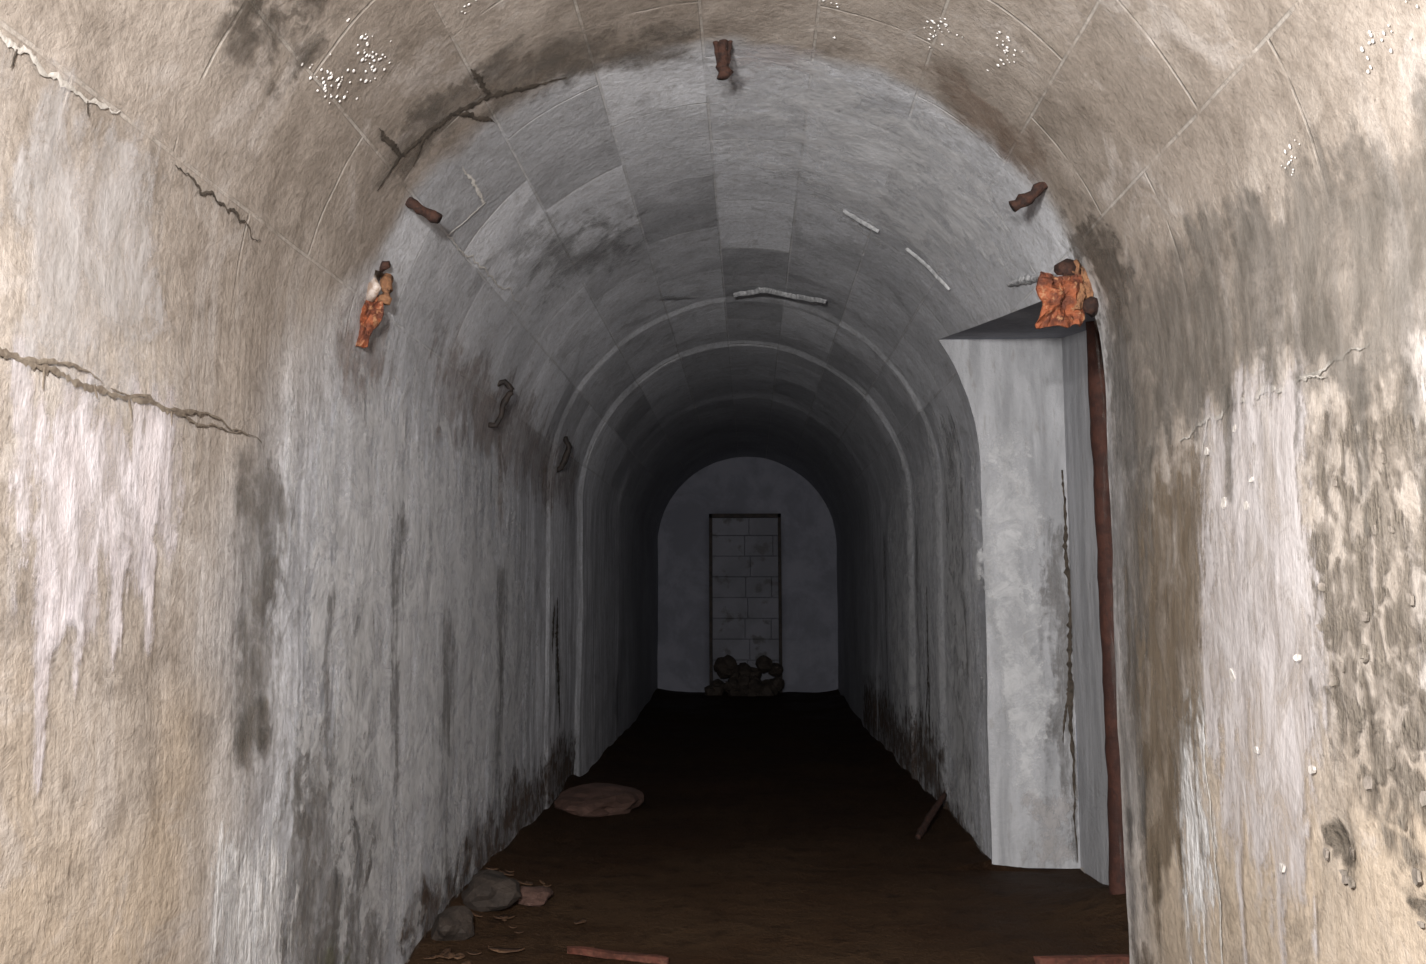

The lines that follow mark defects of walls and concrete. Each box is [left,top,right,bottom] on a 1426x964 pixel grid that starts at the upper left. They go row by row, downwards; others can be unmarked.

crack [0,30,121,115]
damp [220,0,289,63]
damp [294,38,324,79]
crack [175,165,259,241]
damp [9,87,184,792]
crack [0,347,262,442]
damp [1068,139,1426,964]
damp [210,373,532,964]